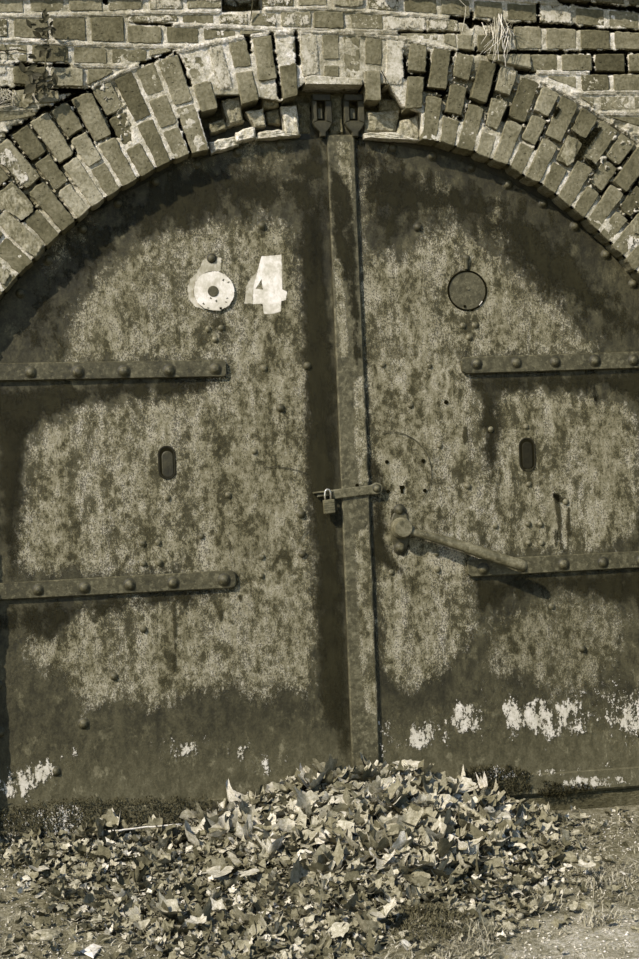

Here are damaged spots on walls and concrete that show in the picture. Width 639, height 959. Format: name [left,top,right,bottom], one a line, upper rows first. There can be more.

spalling [223,0,258,10]
corrosion [553,492,571,550]
peeling [502,680,639,746]
peeling [0,748,77,802]